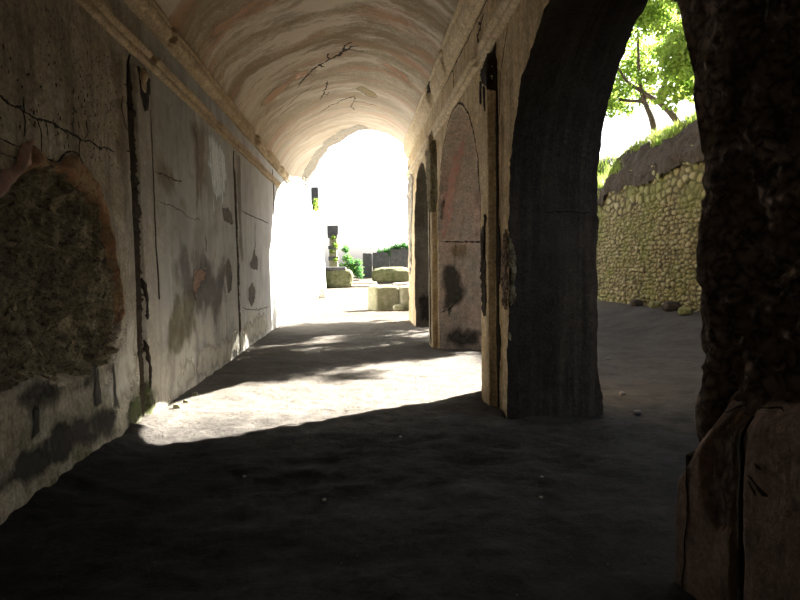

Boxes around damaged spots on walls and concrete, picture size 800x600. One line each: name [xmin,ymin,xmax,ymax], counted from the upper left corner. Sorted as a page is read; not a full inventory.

crack [290,42,376,112]
crack [0,95,130,164]
spalling [0,29,136,392]
leakage [181,248,226,315]
leakage [443,265,464,316]
spalling [498,226,517,310]
leakage [447,329,481,346]